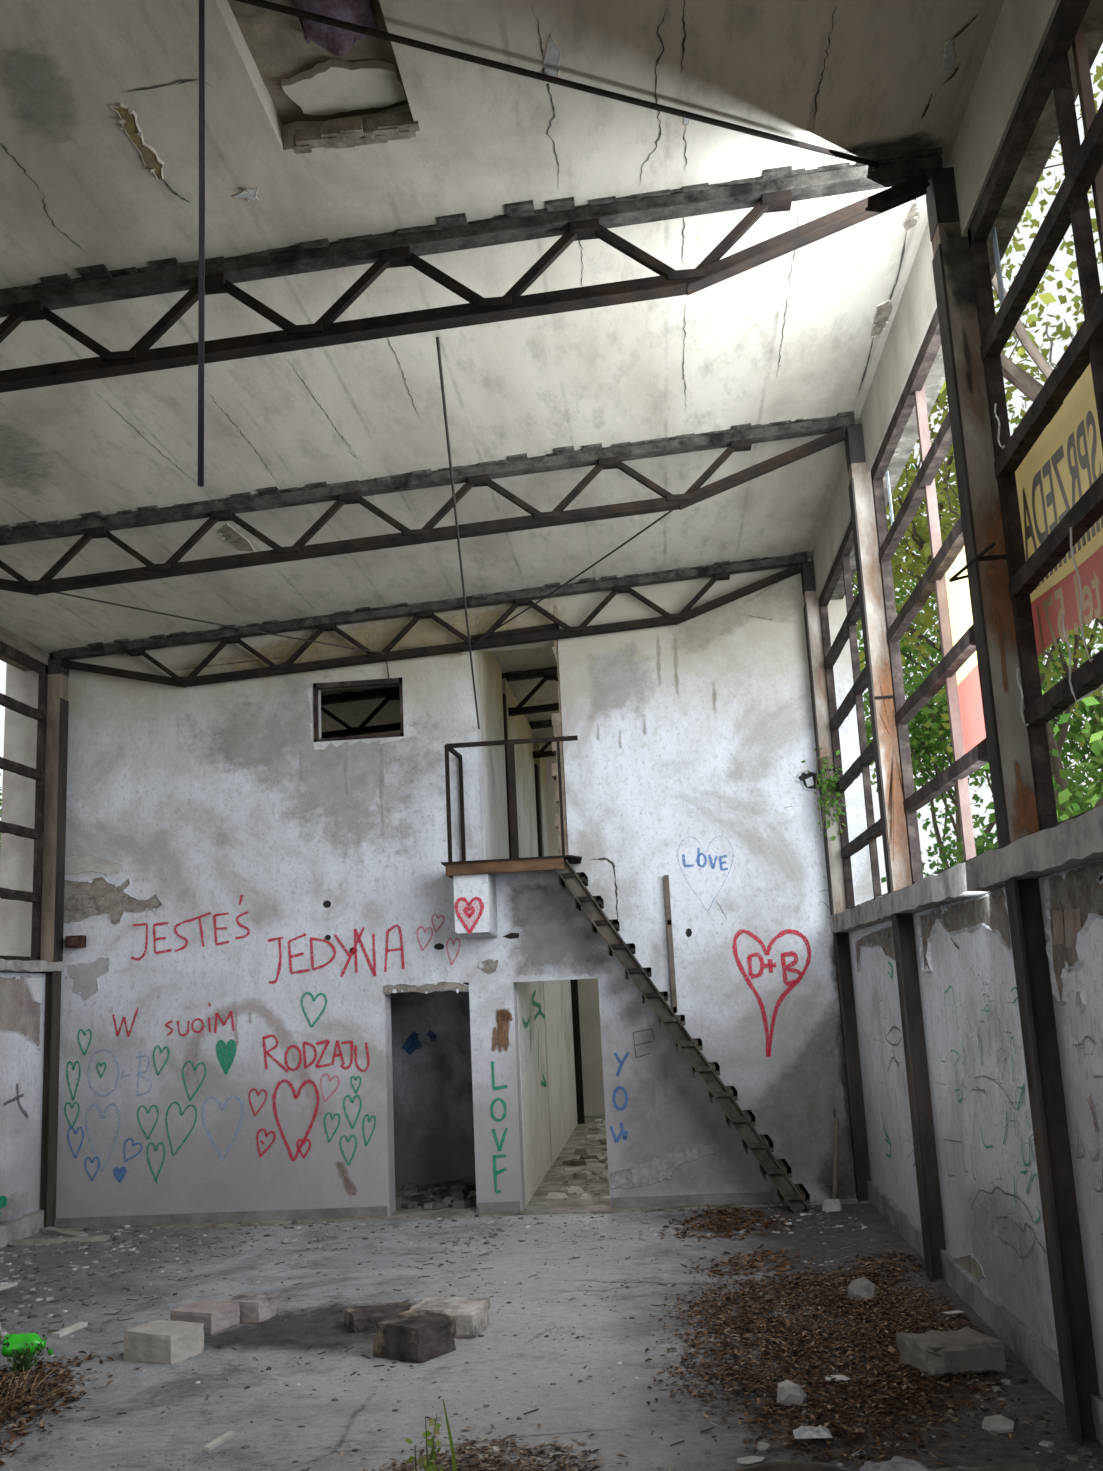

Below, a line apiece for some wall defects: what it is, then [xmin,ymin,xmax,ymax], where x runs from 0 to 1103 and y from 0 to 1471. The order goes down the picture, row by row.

crack [0,143,84,251]
spalling [109,102,190,203]
crack [532,8,559,189]
crack [640,0,687,183]
crack [680,303,688,405]
crack [777,213,799,378]
rust [986,504,1017,691]
rust [880,661,908,852]
rust [1014,762,1039,834]
flaking render [0,975,42,1051]
flaking render [64,854,163,927]
flaking render [1044,858,1103,1014]